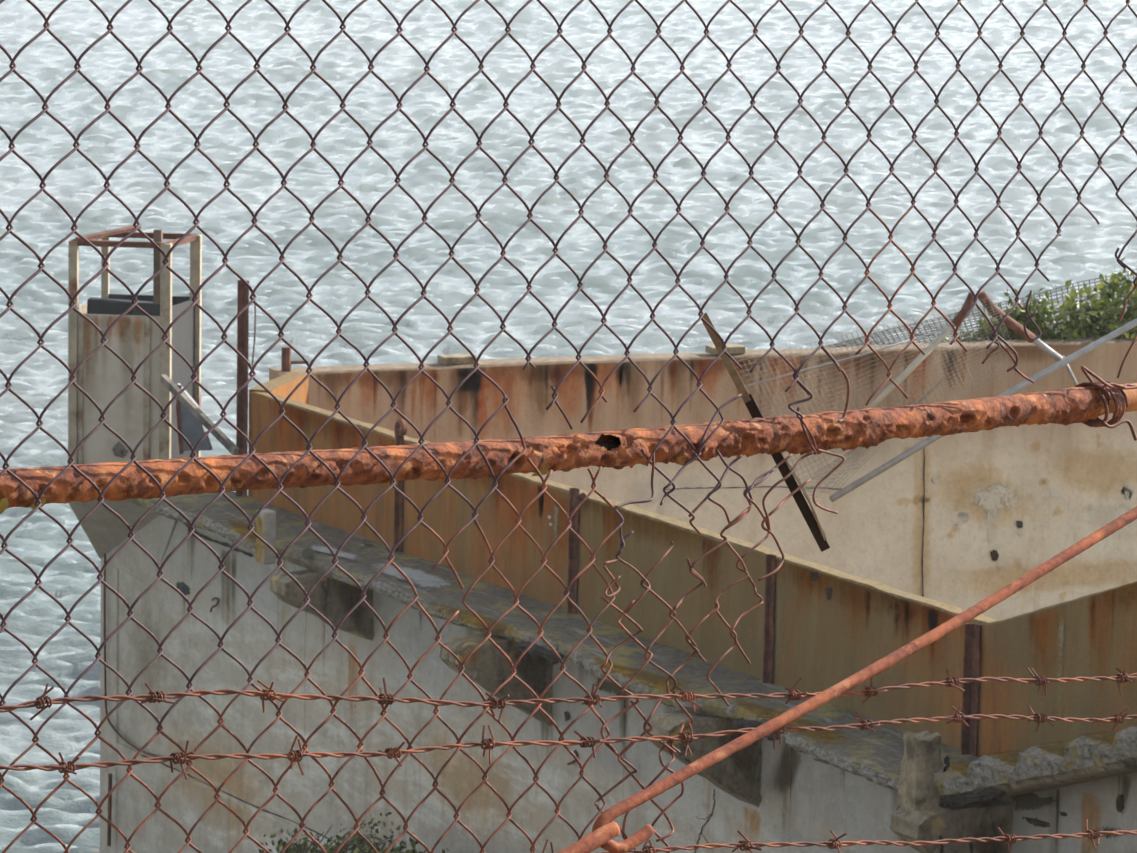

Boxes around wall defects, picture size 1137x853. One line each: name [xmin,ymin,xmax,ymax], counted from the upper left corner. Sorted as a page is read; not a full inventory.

spalling [939,788,1006,807]
spalling [1116,794,1124,813]
crack [694,790,715,853]